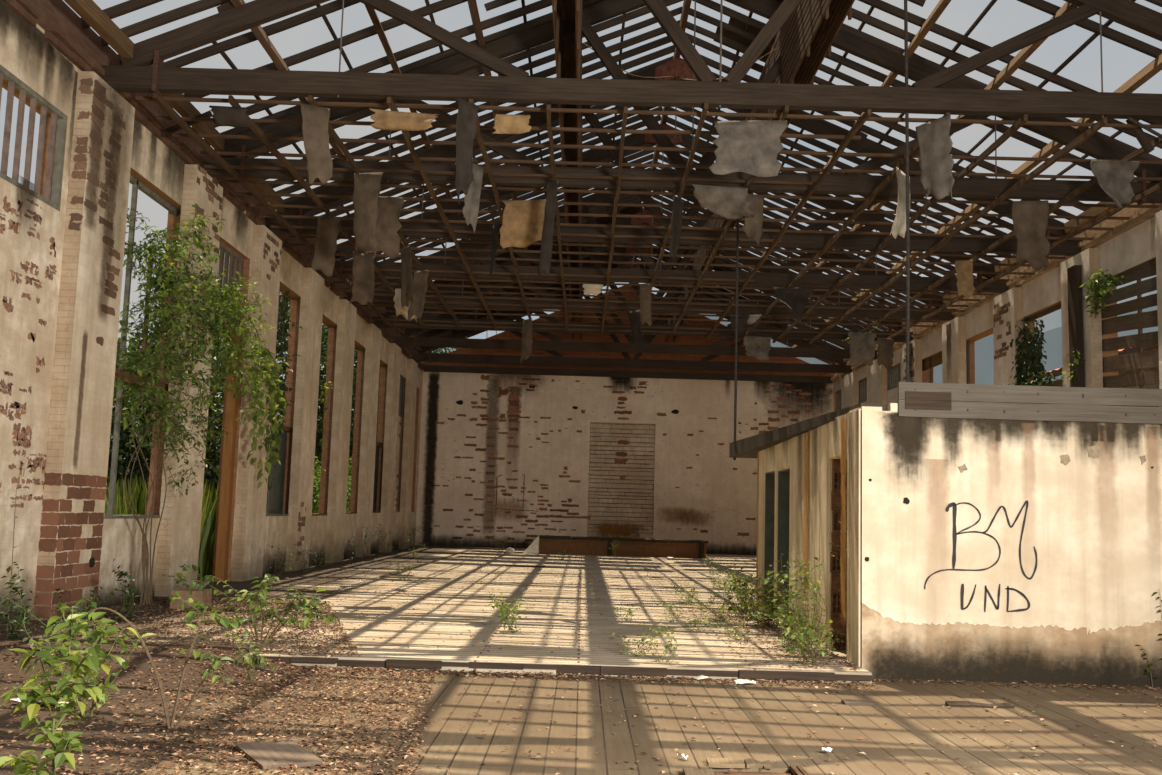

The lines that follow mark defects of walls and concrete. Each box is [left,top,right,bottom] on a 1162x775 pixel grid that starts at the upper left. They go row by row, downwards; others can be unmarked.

peeling [0,194,57,313]
flaking render [68,78,126,316]
peeling [27,319,47,373]
flaking render [0,371,107,619]
damp [886,412,1162,461]
damp [872,648,1162,687]